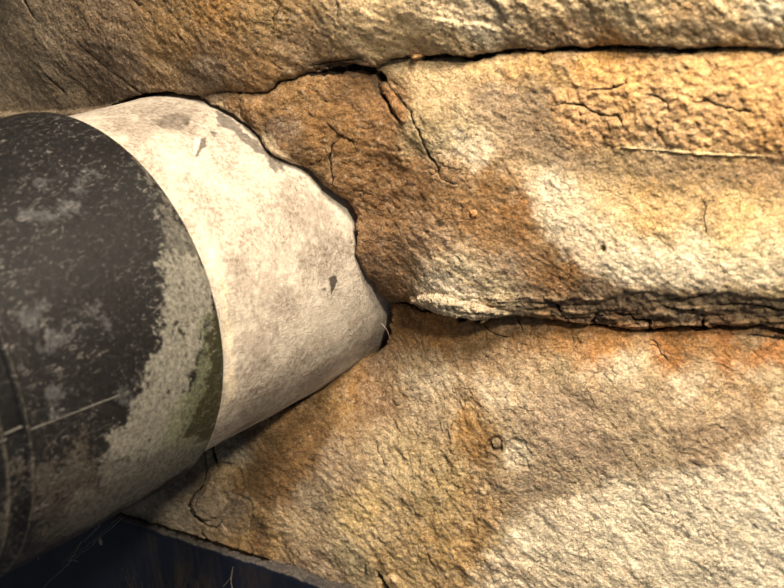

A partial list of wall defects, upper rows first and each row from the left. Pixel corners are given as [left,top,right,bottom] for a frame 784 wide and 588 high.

crack [239,45,784,185]
crack [188,446,243,539]
damp [357,337,784,588]